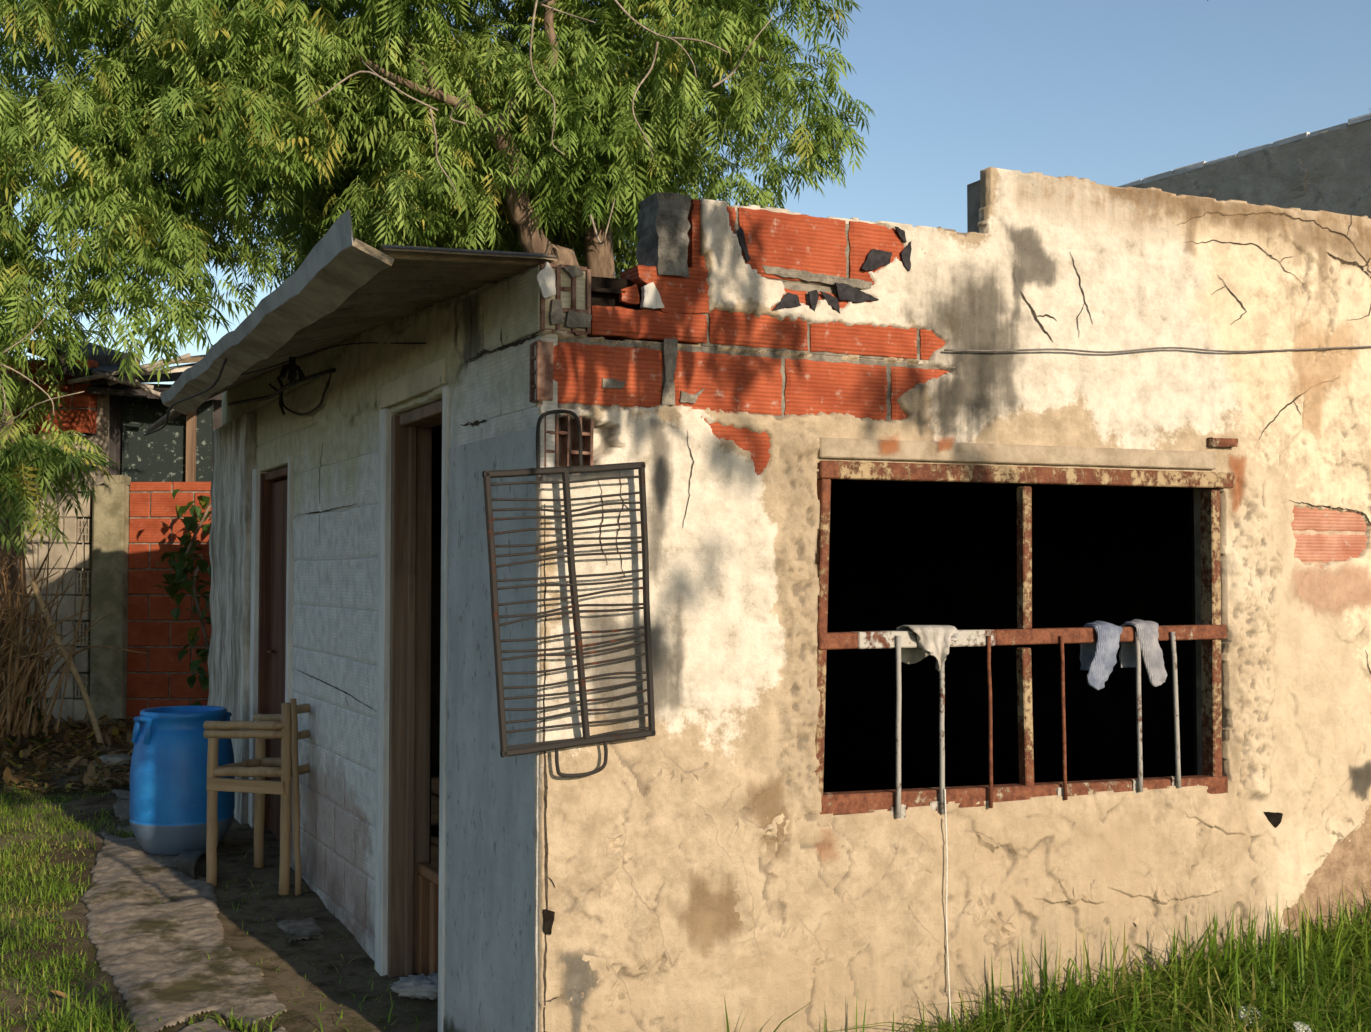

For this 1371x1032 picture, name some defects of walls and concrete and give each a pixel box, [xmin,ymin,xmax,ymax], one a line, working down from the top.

flaking render [502,206,950,475]
crack [1021,252,1093,341]
crack [1177,211,1371,325]
flaking render [1291,506,1371,609]
flaking render [1279,788,1371,944]